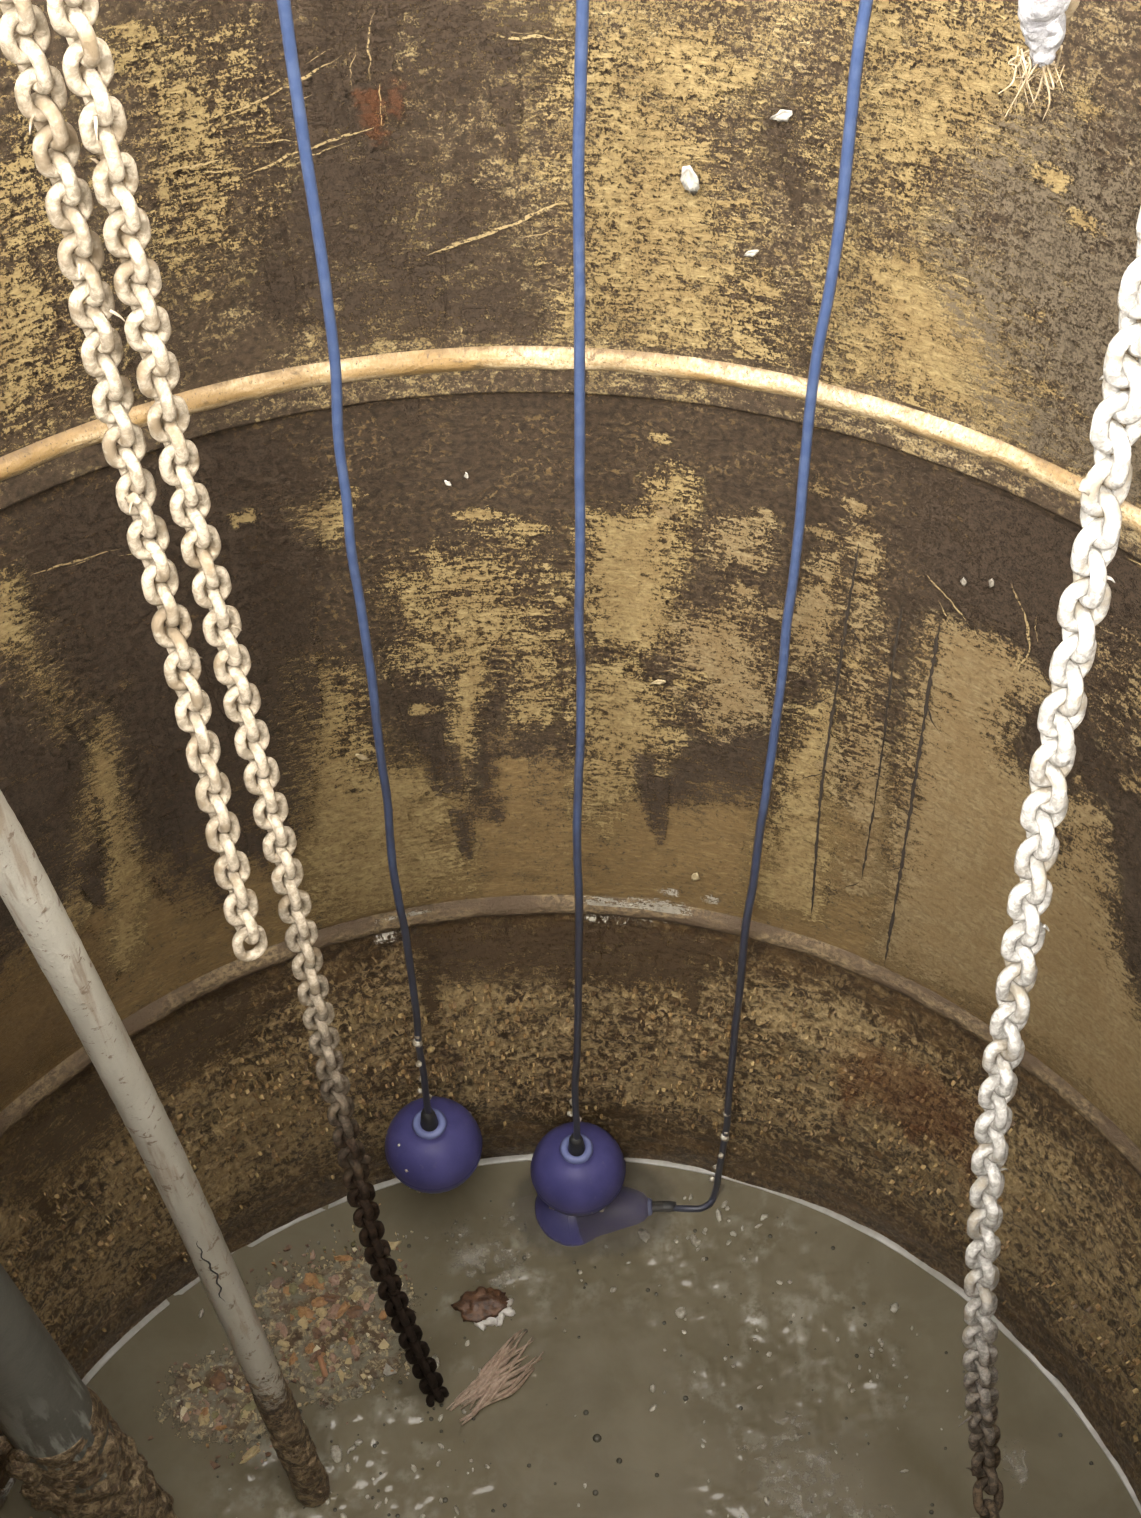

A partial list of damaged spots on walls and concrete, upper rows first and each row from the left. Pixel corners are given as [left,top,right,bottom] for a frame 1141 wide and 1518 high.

damp [381,631,506,860]
crack [801,544,940,960]